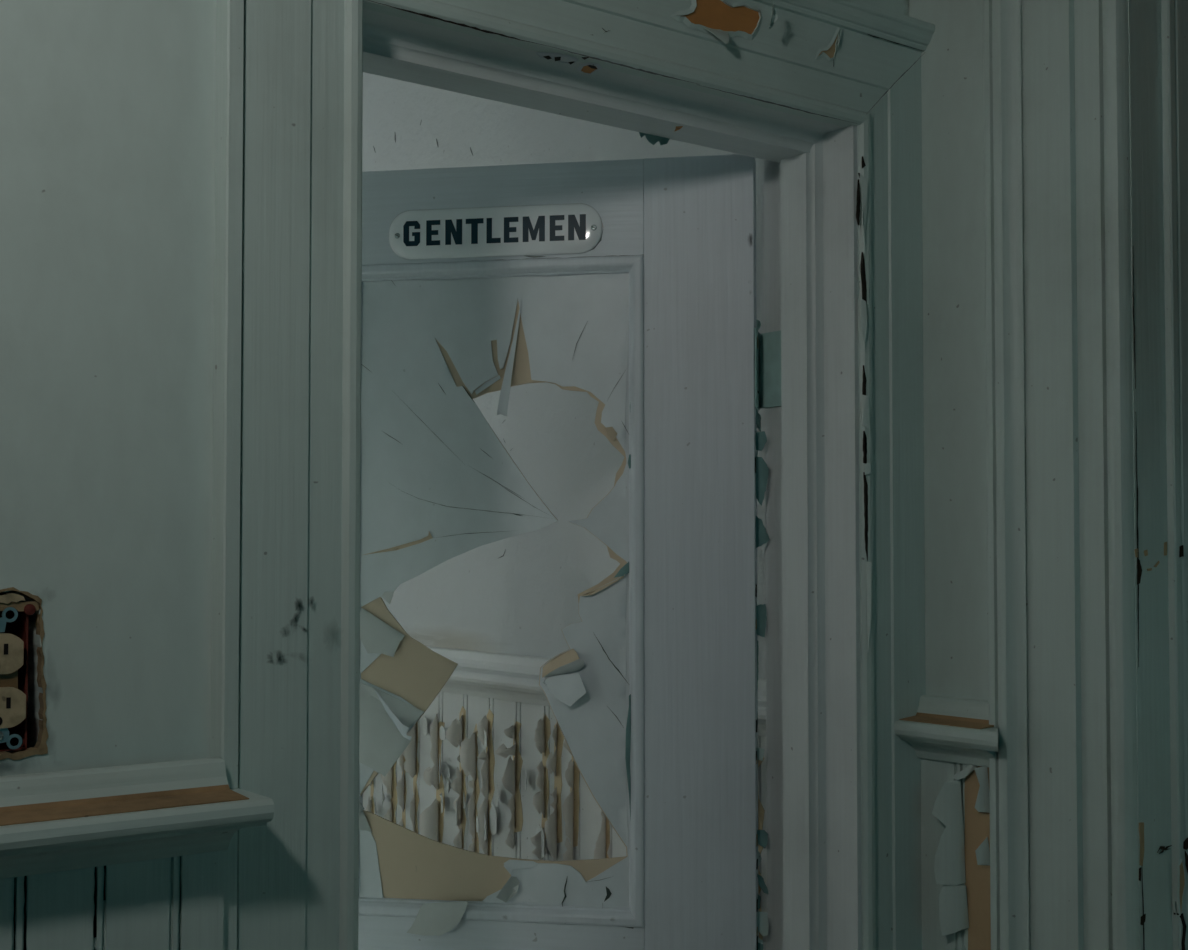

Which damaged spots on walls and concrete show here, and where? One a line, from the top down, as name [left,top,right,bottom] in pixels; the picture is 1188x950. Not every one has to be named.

peeling [671,0,778,44]
crack [1130,266,1138,389]
peeling [755,408,770,548]
crack [1133,429,1141,667]
peeling [755,584,767,689]
peeling [365,706,580,861]
peeling [593,810,610,859]
peeling [756,793,769,950]
peeling [932,764,991,950]
crack [1139,876,1147,950]